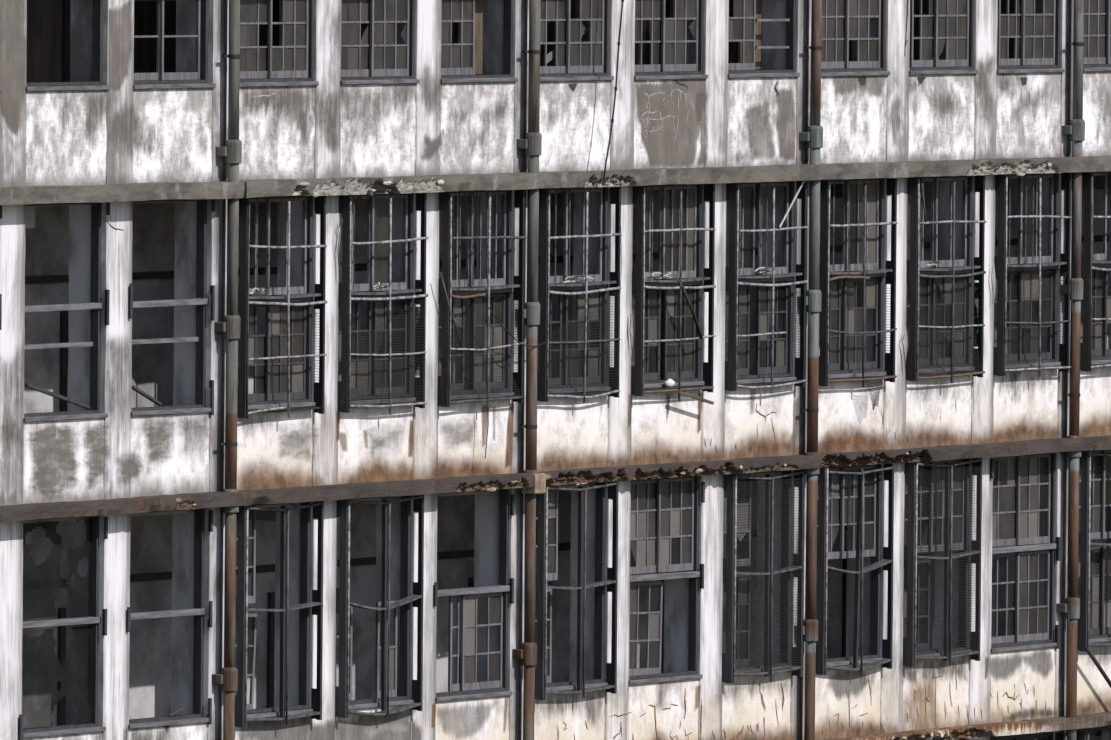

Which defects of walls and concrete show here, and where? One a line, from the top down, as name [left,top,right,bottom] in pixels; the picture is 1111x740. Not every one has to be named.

damp [977,59,1009,109]
damp [86,95,103,138]
damp [246,86,409,150]
damp [480,105,506,144]
damp [640,89,707,164]
rust [242,470,299,490]
rust [337,411,346,449]
rust [350,421,413,483]
rust [432,462,493,478]
rust [444,405,489,445]
rust [506,404,514,466]
damp [901,656,966,681]